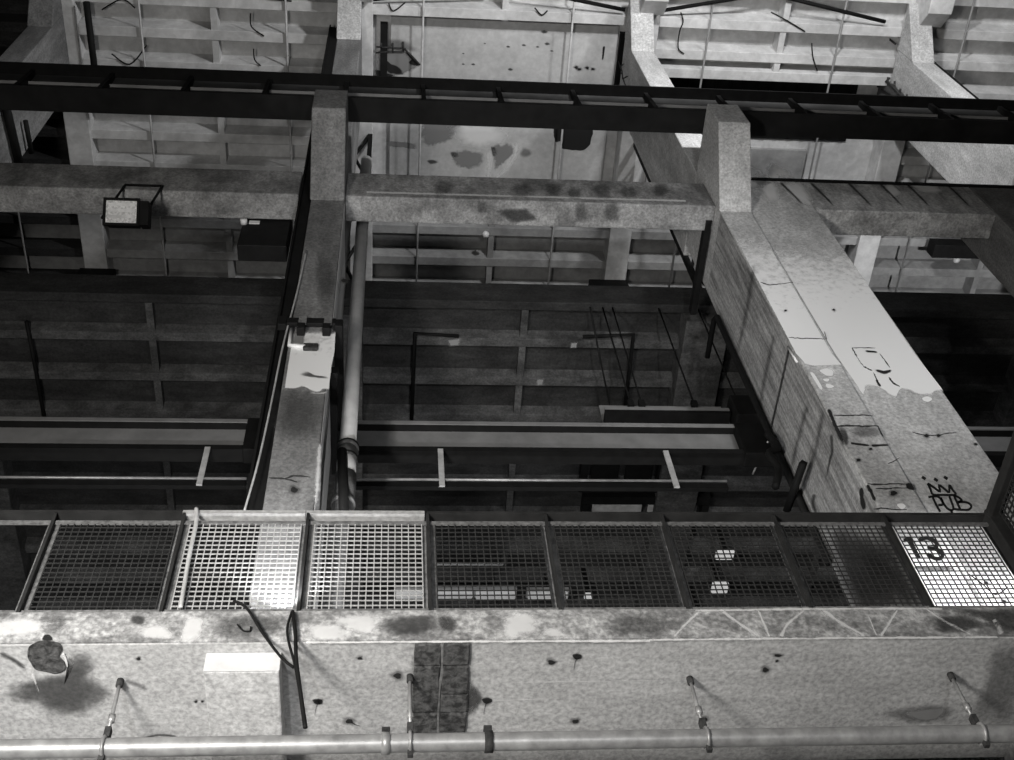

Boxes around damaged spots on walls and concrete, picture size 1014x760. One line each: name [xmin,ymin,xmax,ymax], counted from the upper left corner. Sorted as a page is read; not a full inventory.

damp [367,191,686,202]
damp [502,210,534,222]
peeling [740,245,942,402]